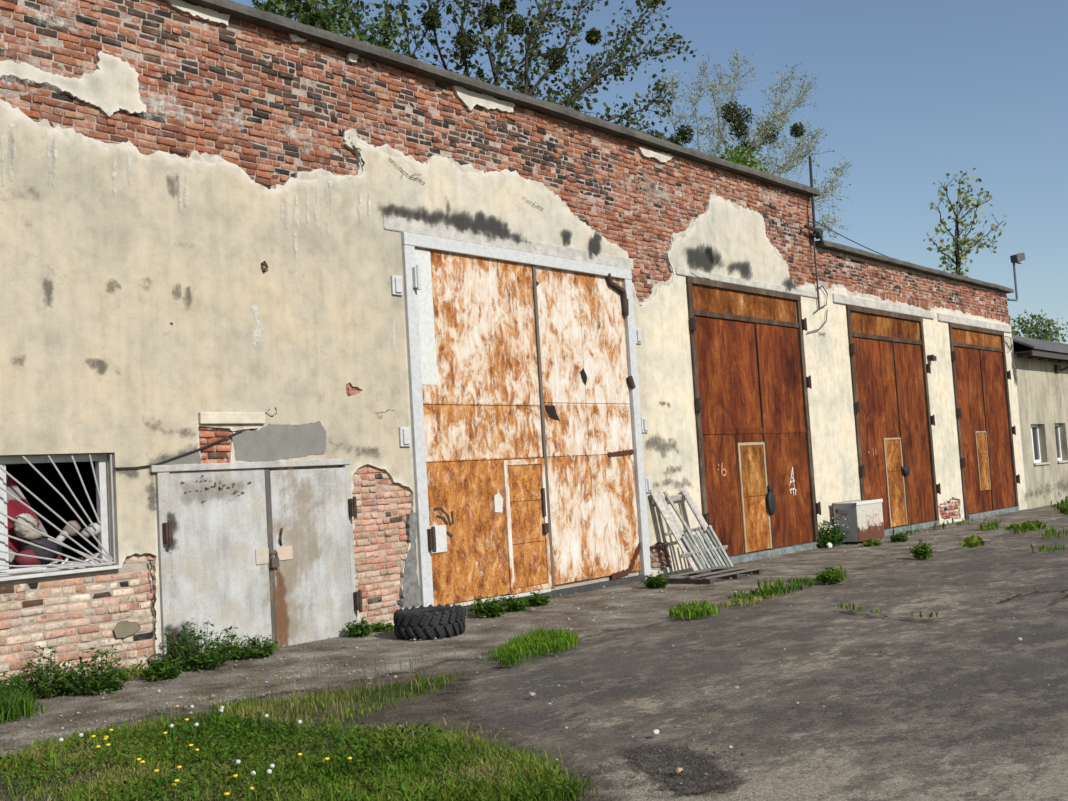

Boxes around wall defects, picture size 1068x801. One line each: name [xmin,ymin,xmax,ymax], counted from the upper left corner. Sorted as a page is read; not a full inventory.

flaking render [0,0,1012,352]
damp [359,194,527,243]
damp [588,231,602,258]
damp [688,244,752,279]
flaking render [181,427,257,504]
flaking render [352,465,411,625]
flaking render [938,497,960,520]
flaking render [0,555,154,694]
rust [275,569,289,648]